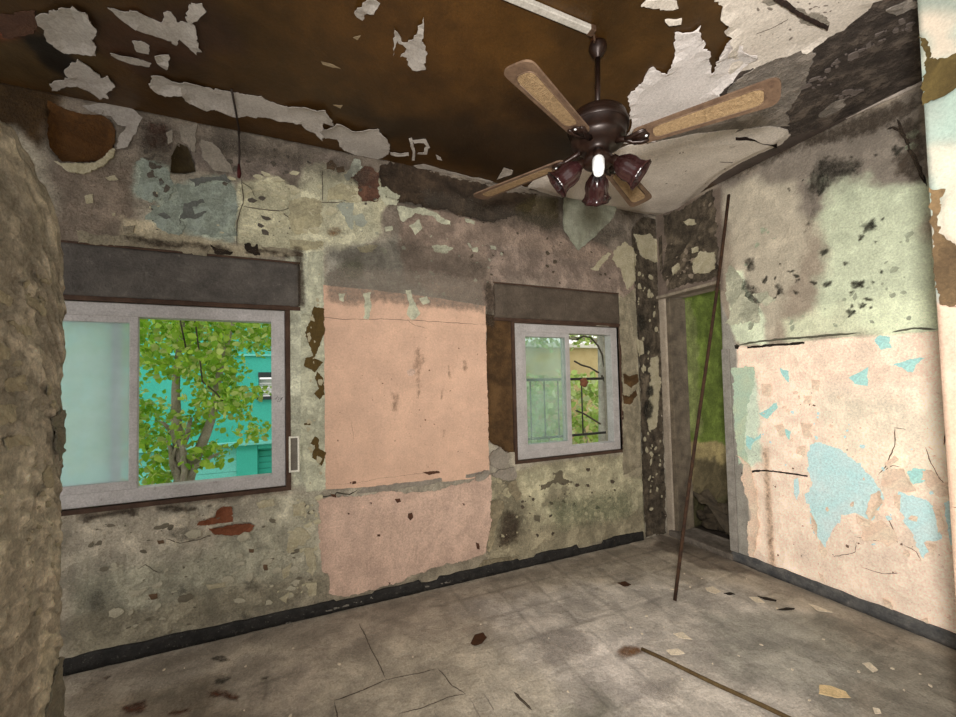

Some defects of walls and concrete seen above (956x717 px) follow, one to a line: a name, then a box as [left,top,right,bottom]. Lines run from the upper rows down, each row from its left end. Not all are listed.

spalling [0,0,537,320]
damp [747,100,923,180]
peeling [304,298,325,400]
damp [329,263,495,326]
spalling [466,183,776,567]
damp [741,263,831,303]
crack [736,333,855,346]
damp [846,270,882,317]
crack [893,325,935,333]
peeling [928,187,956,307]
peeling [731,366,952,560]
crack [878,428,906,475]